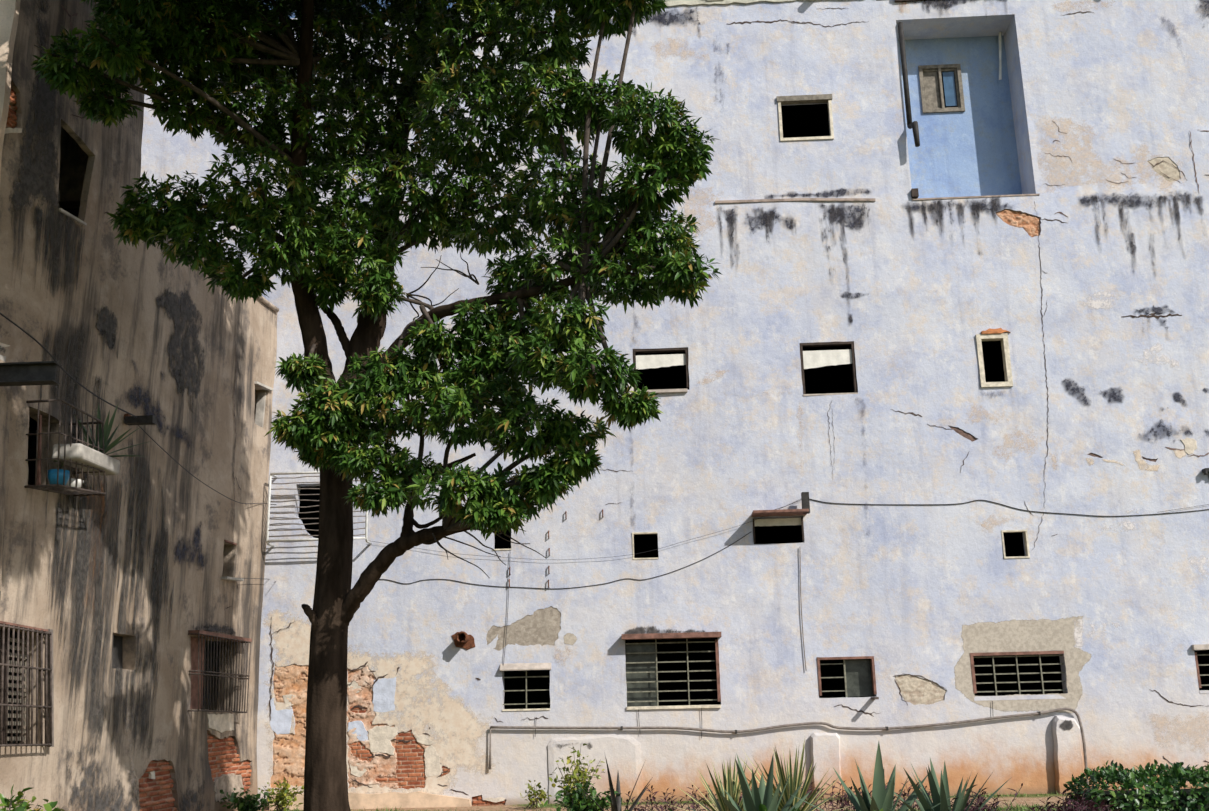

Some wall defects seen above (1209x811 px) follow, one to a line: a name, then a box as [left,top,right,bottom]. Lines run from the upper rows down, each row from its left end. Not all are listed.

crack [731,8,864,27]
crack [1190,129,1207,191]
damp [905,197,1013,237]
spalling [996,209,1068,237]
damp [1080,192,1203,255]
damp [156,289,205,410]
crack [1025,201,1057,550]
mould [1063,379,1089,406]
flaking render [452,606,577,659]
peeling [266,610,311,735]
flaking render [207,713,252,803]
peeling [347,651,506,806]